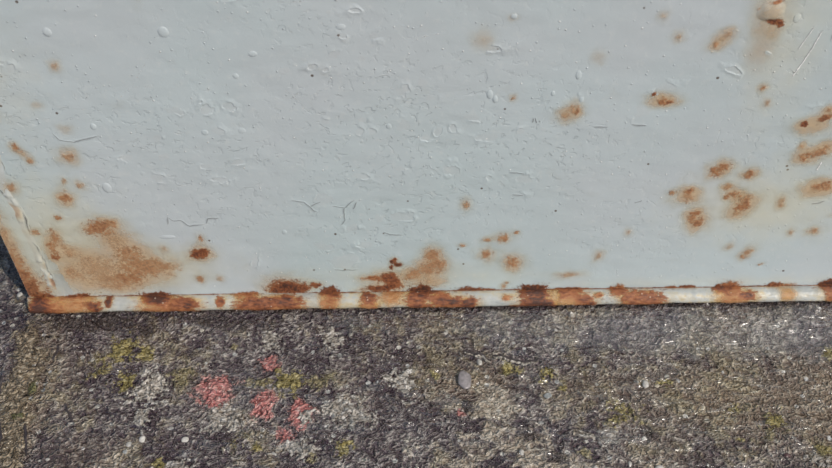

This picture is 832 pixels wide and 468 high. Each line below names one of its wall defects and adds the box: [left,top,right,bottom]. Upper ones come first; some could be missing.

corrosion [561,106,582,119]
corrosion [651,92,676,106]
corrosion [794,106,832,163]
corrosion [56,193,73,206]
corrosion [670,186,706,231]
corrosion [710,161,756,218]
corrosion [802,178,832,196]
corrosion [0,218,832,314]